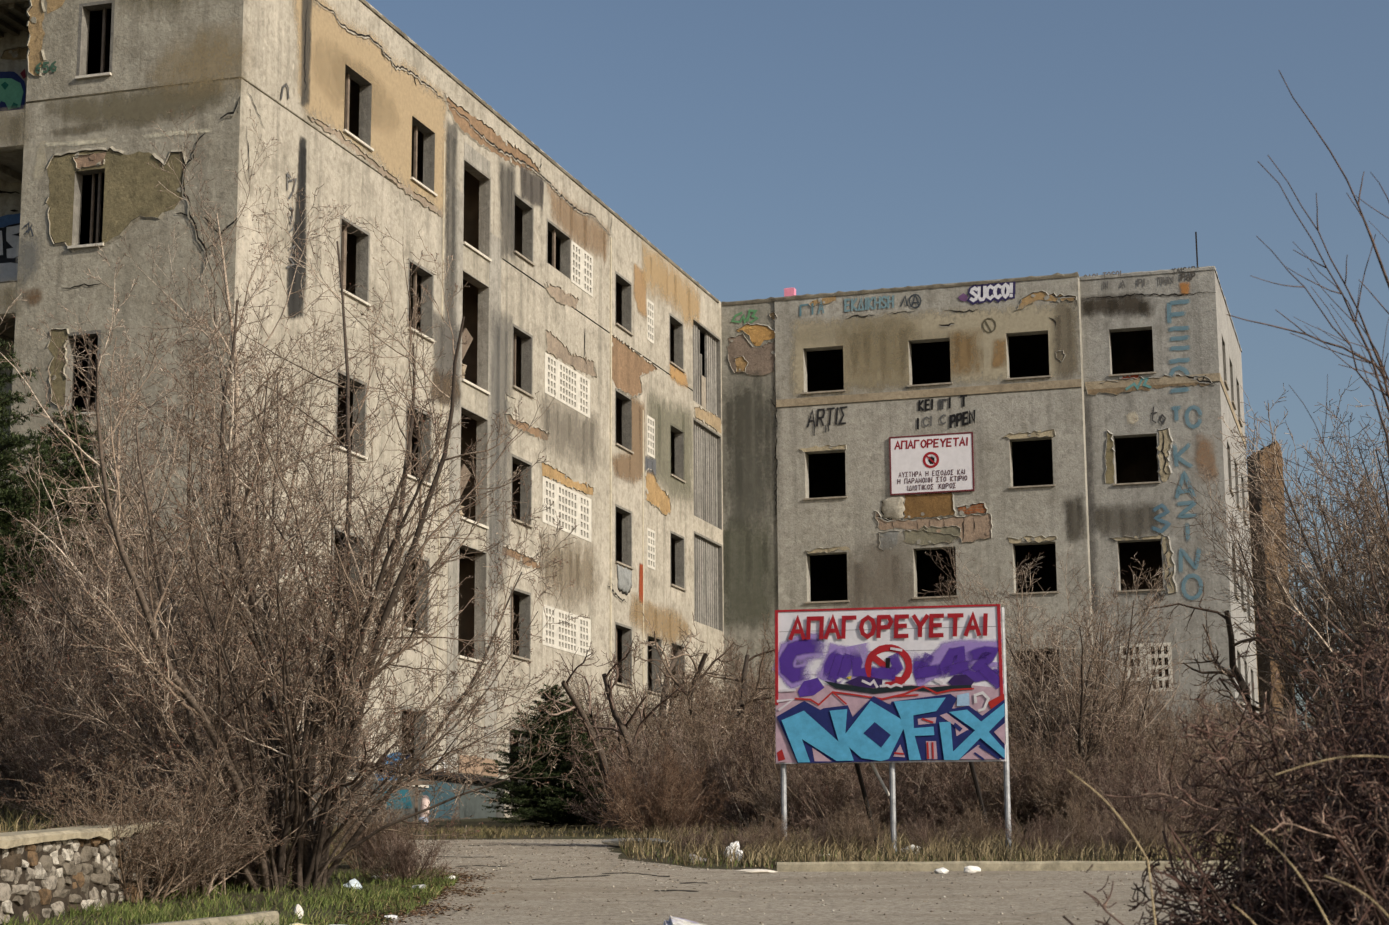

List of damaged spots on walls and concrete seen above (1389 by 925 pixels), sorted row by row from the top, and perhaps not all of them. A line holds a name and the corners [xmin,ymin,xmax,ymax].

spalling [0,0,65,79]
spalling [45,146,188,253]
crack [175,90,265,284]
peeling [307,115,443,218]
spalling [47,328,69,409]
spalling [545,330,657,398]
peeling [727,312,777,376]
spalling [645,468,671,516]
damp [723,377,776,625]
spalling [874,492,1058,549]
spalling [1104,430,1115,484]
spalling [1156,427,1173,482]